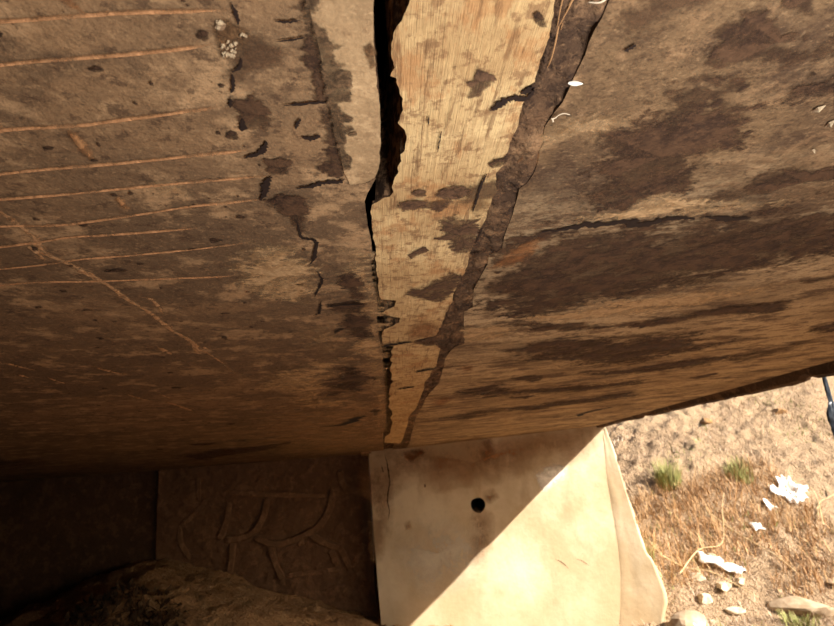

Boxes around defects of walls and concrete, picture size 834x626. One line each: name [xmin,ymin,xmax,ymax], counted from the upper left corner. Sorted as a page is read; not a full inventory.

water stain [229,37,282,83]
water stain [232,94,273,131]
water stain [294,0,357,179]
crack [490,87,535,111]
water stain [263,158,293,175]
crack [473,174,487,211]
water stain [264,194,310,232]
water stain [398,10,834,420]
crack [542,216,751,233]
water stain [327,272,375,340]
water stain [315,367,379,396]
crack [381,454,390,518]